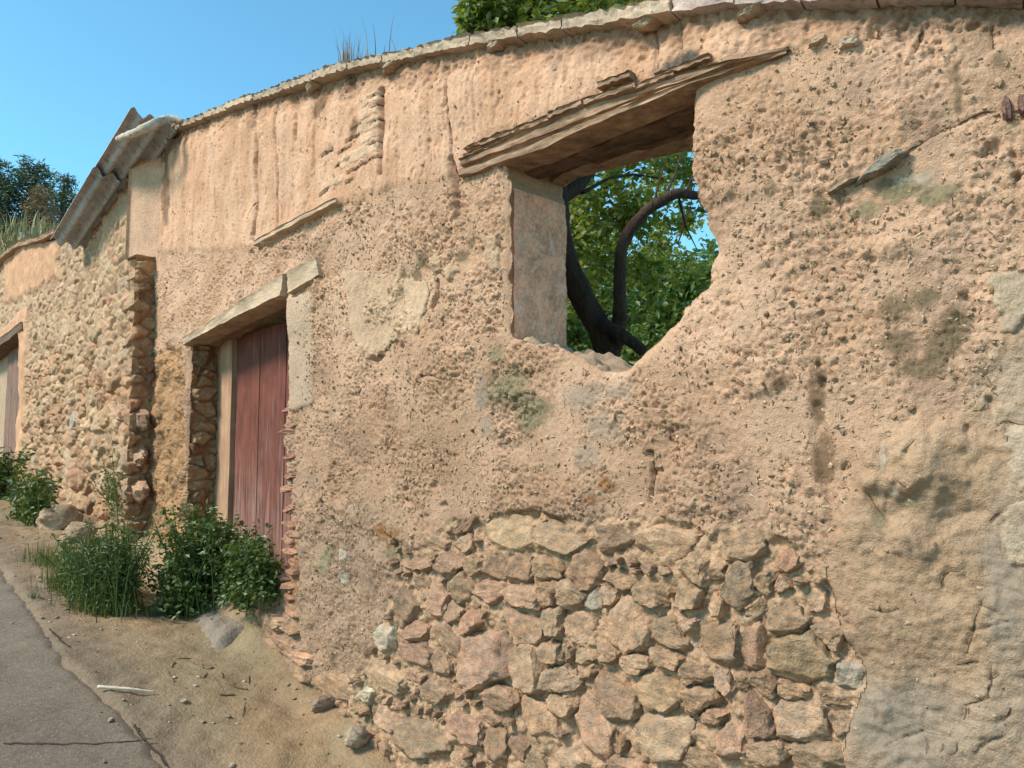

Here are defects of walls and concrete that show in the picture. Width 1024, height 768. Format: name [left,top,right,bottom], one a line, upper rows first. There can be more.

crack [908,111,996,151]
water stain [808,362,826,419]
water stain [813,432,834,483]